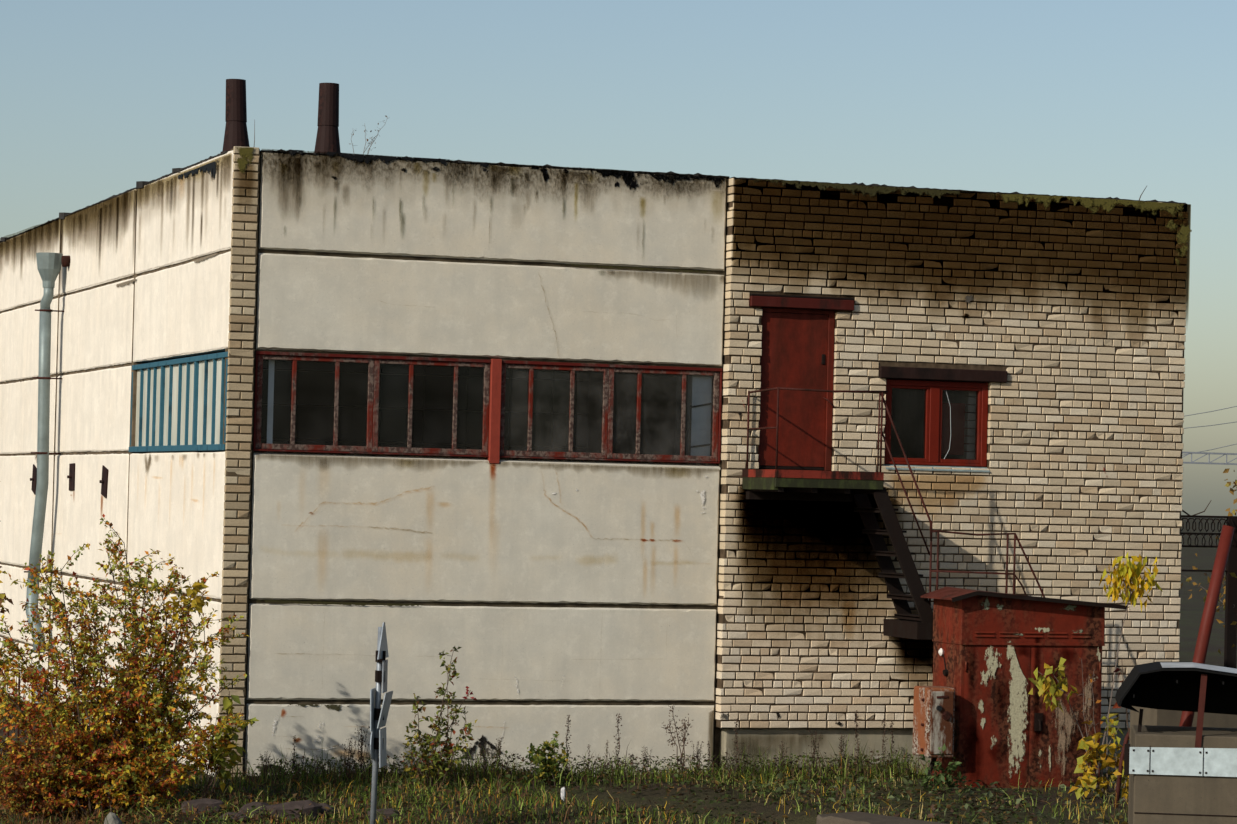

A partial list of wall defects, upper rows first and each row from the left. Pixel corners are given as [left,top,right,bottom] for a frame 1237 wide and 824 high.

leakage [0,176,176,256]
leakage [192,149,1191,317]
peeling [978,627,1095,778]